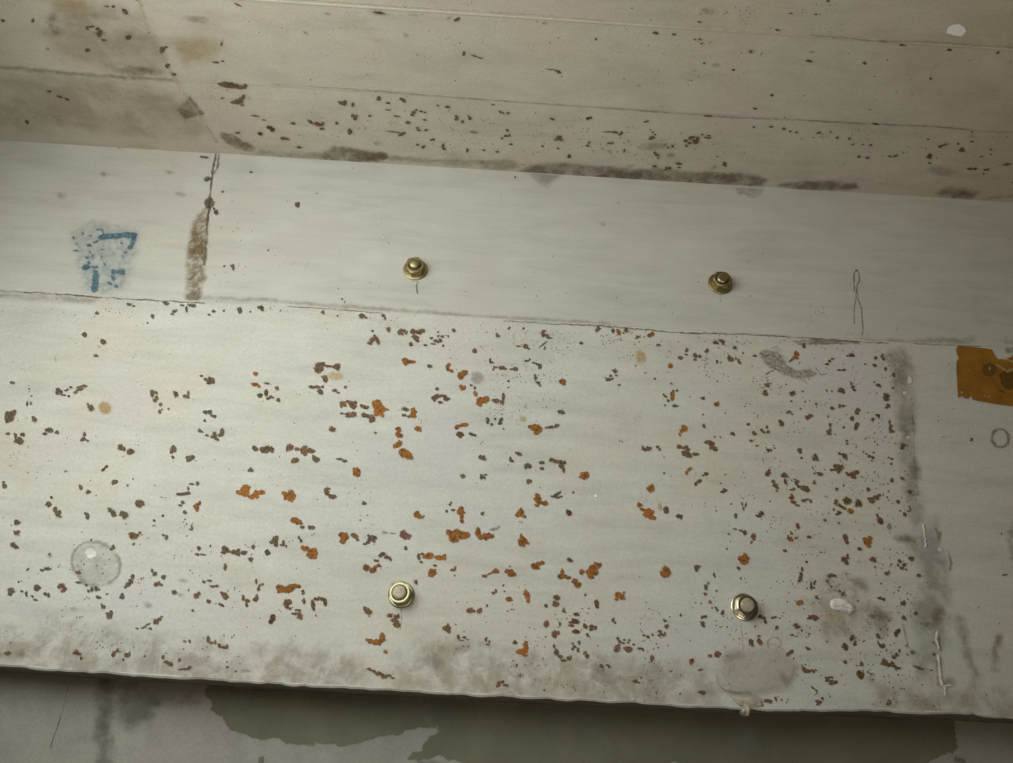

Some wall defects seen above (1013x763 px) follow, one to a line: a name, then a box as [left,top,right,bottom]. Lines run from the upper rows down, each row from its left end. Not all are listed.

damp [222,134,251,150]
damp [326,148,386,162]
damp [527,164,668,181]
damp [683,173,764,185]
damp [783,182,857,190]
corrosion [367,327,425,346]
corrosion [446,363,505,406]
corrosion [340,399,389,423]
corrosion [515,451,566,507]
corrosion [446,506,494,542]
corrosion [557,562,602,588]
corrosion [276,583,327,620]